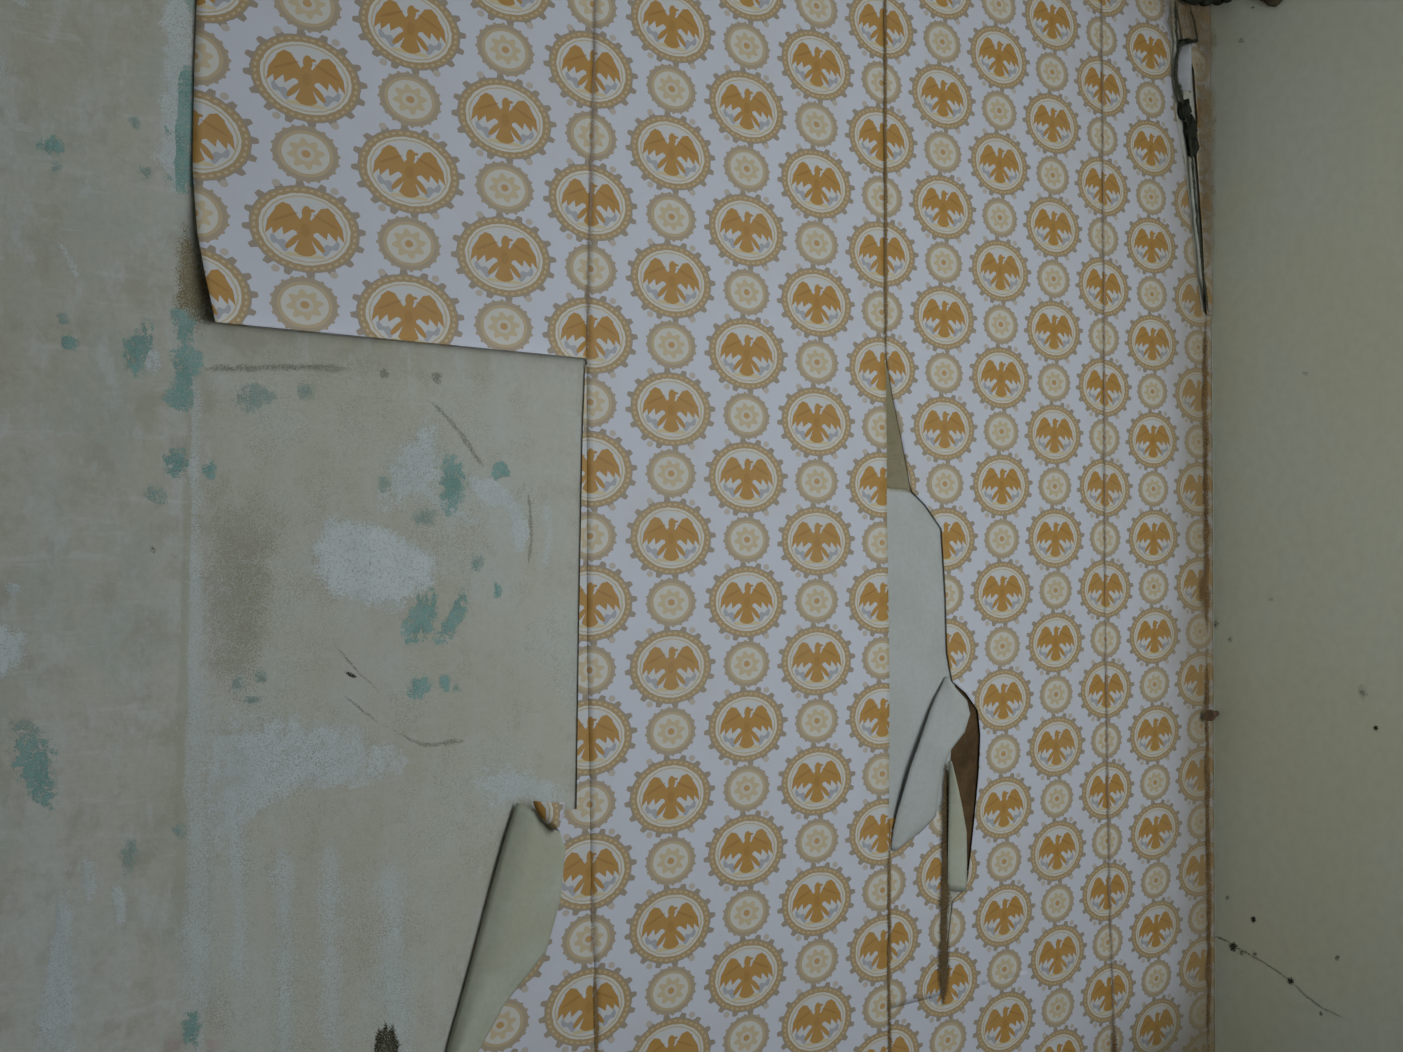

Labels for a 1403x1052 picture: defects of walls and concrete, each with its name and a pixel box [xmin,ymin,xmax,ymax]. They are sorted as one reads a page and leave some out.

peeling [137,0,197,195]
peeling [120,306,204,412]
peeling [142,447,217,508]
peeling [6,719,60,813]
spalling [374,1023,403,1052]